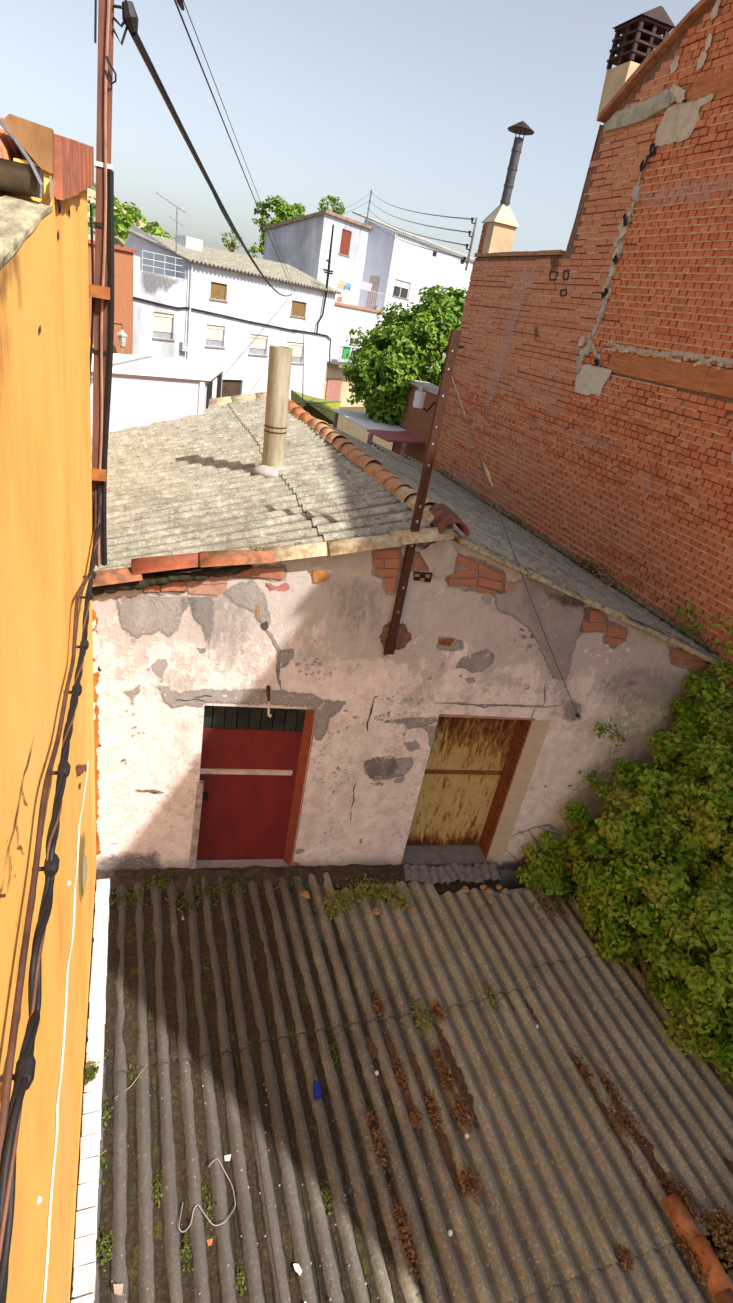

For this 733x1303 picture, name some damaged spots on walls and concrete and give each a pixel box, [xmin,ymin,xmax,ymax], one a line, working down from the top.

crack [576,155,733,375]
flaking render [115,564,287,653]
crack [255,605,293,690]
flaking render [371,546,630,684]
flaking render [668,647,718,675]
flaking render [123,685,147,739]
flaking render [147,648,438,794]